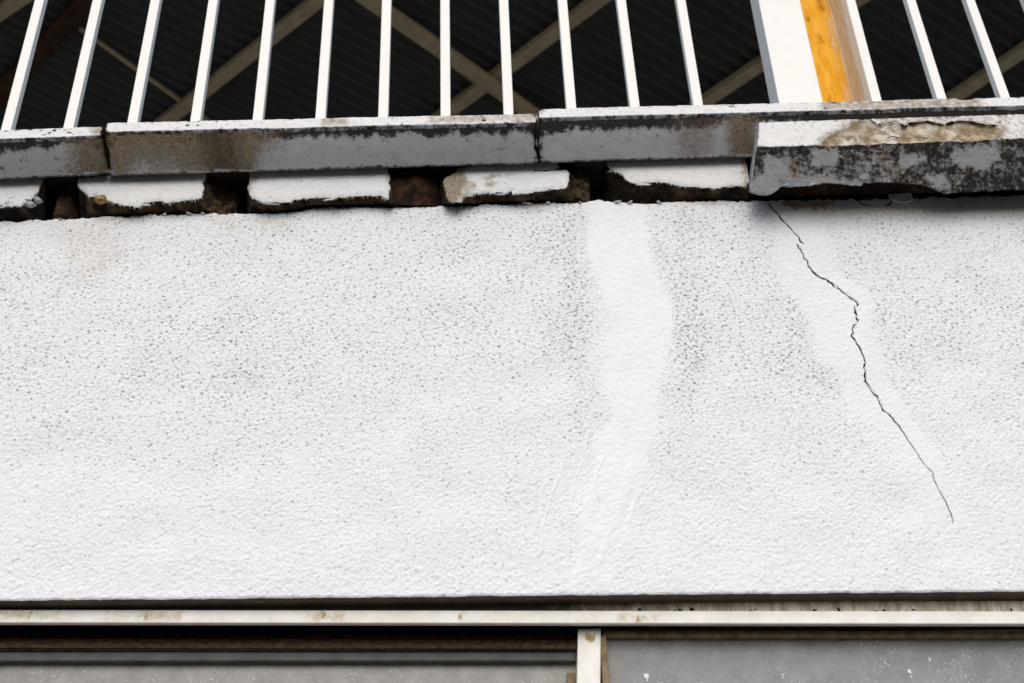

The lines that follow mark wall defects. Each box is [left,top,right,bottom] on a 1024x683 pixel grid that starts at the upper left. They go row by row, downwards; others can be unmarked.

leakage [68,132,278,174]
spalling [821,119,1001,146]
spalling [0,179,63,223]
spalling [78,169,397,219]
spalling [440,162,948,207]
crack [768,202,953,521]